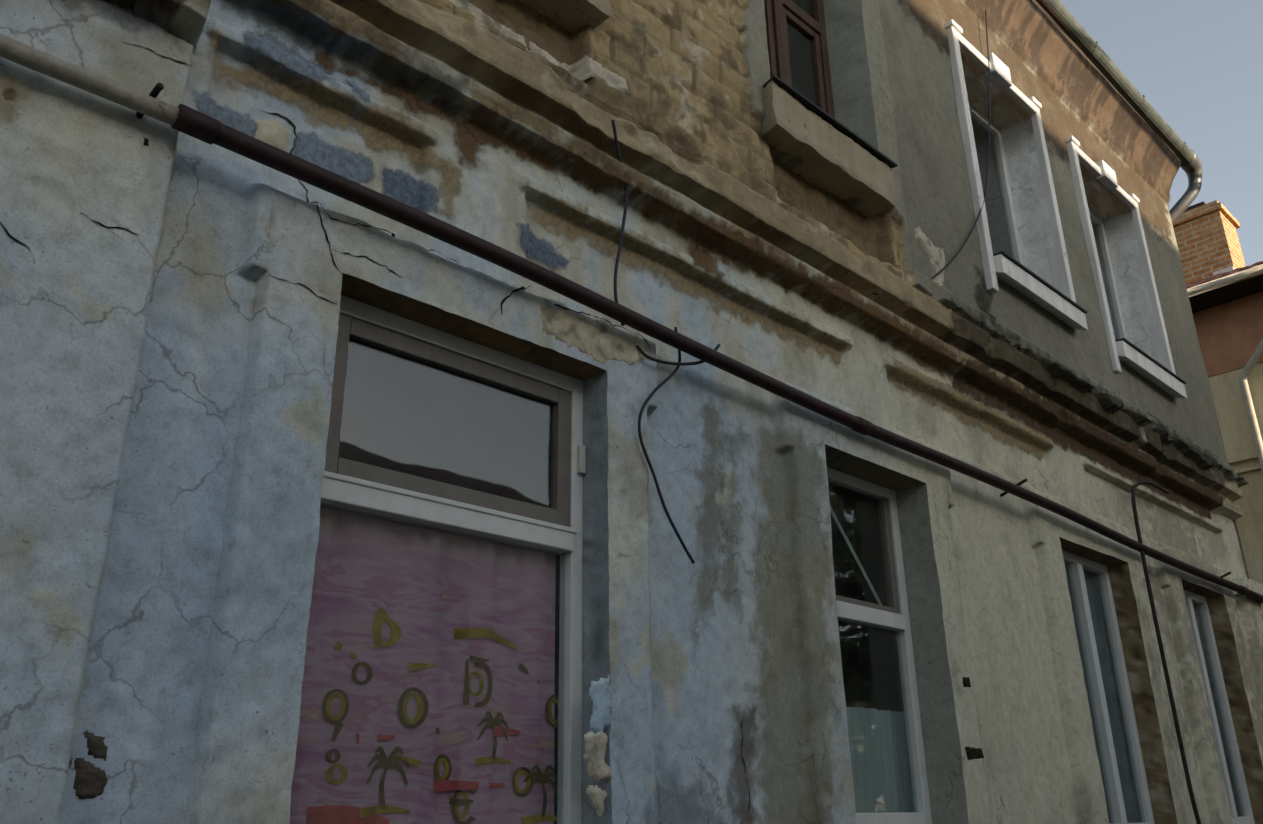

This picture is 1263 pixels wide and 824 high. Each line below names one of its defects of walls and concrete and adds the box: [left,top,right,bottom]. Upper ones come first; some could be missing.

crack [106,0,191,66]
peeling [244,32,370,102]
peeling [193,90,258,137]
peeling [295,132,439,213]
crack [0,221,35,263]
crack [80,212,140,238]
crack [262,110,403,304]
crack [501,285,650,347]
peeling [584,674,612,816]